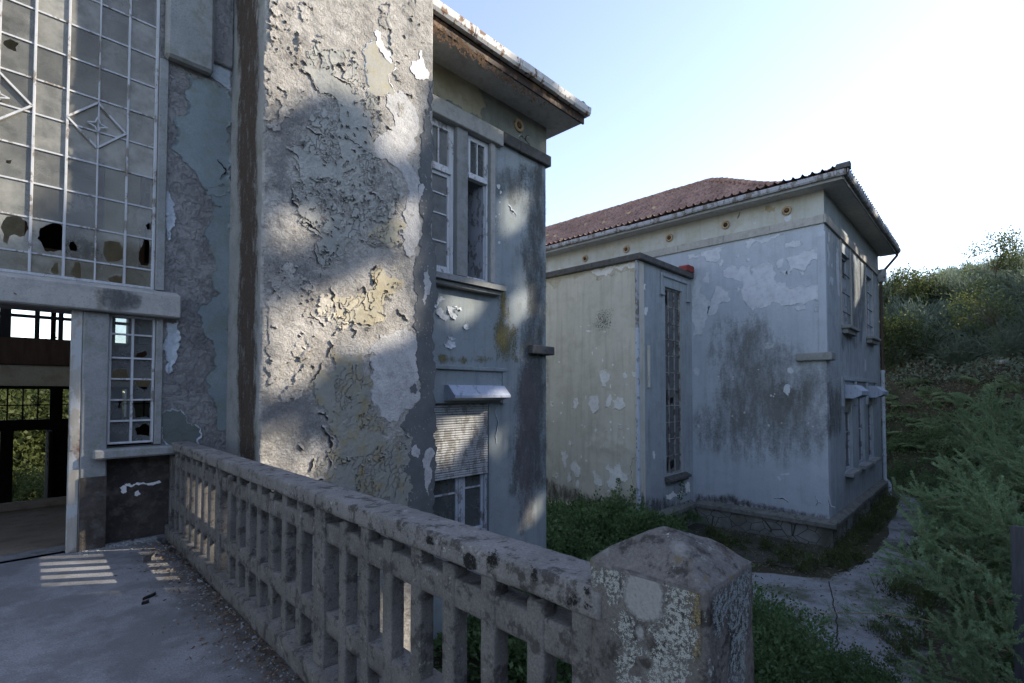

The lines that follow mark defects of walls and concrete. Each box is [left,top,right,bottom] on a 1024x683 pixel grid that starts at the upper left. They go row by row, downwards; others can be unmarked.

rust [433,25,545,105]
peeling [166,191,176,240]
peeling [170,63,232,431]
peeling [263,0,486,514]
peeling [688,205,818,336]
peeling [163,322,181,374]
damp [494,163,626,520]
peeling [550,347,635,434]
damp [714,328,841,449]
peeling [120,481,161,496]
peeling [552,440,629,492]